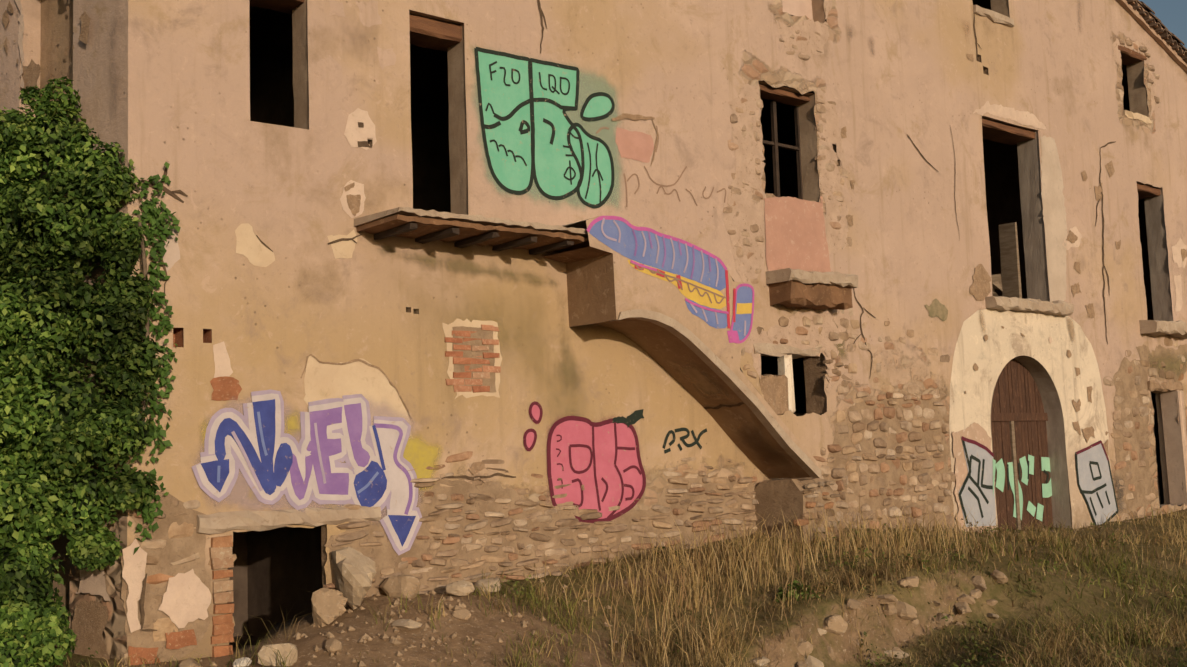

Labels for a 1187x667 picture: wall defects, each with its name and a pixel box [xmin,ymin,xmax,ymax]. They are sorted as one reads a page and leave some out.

flaking render [2,1,40,93]
crack [537,0,547,53]
flaking render [775,0,832,61]
flaking render [340,180,366,218]
flaking render [344,108,377,150]
flaking render [612,113,659,165]
flaking render [723,84,766,285]
flaking render [815,87,855,253]
flaking render [442,318,502,399]
flaking render [741,305,995,533]
flaking render [1072,337,1187,514]
flaking render [71,491,213,665]